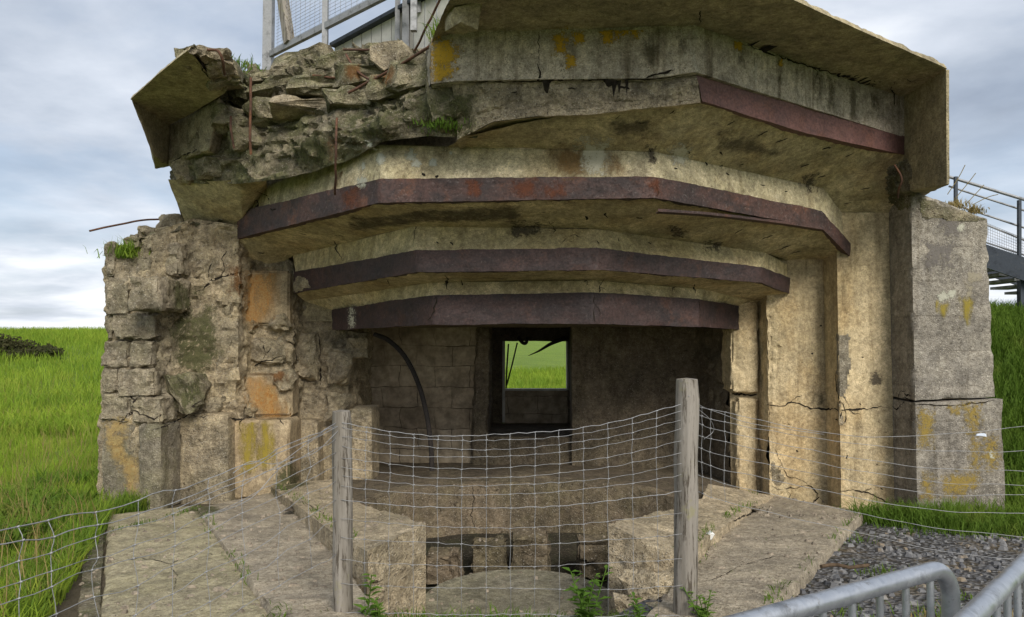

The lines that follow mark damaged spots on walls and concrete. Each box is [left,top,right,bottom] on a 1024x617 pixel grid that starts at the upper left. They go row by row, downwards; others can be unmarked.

spalling [207,48,226,75]
crack [748,41,911,106]
crack [732,374,993,424]
crack [776,451,909,504]